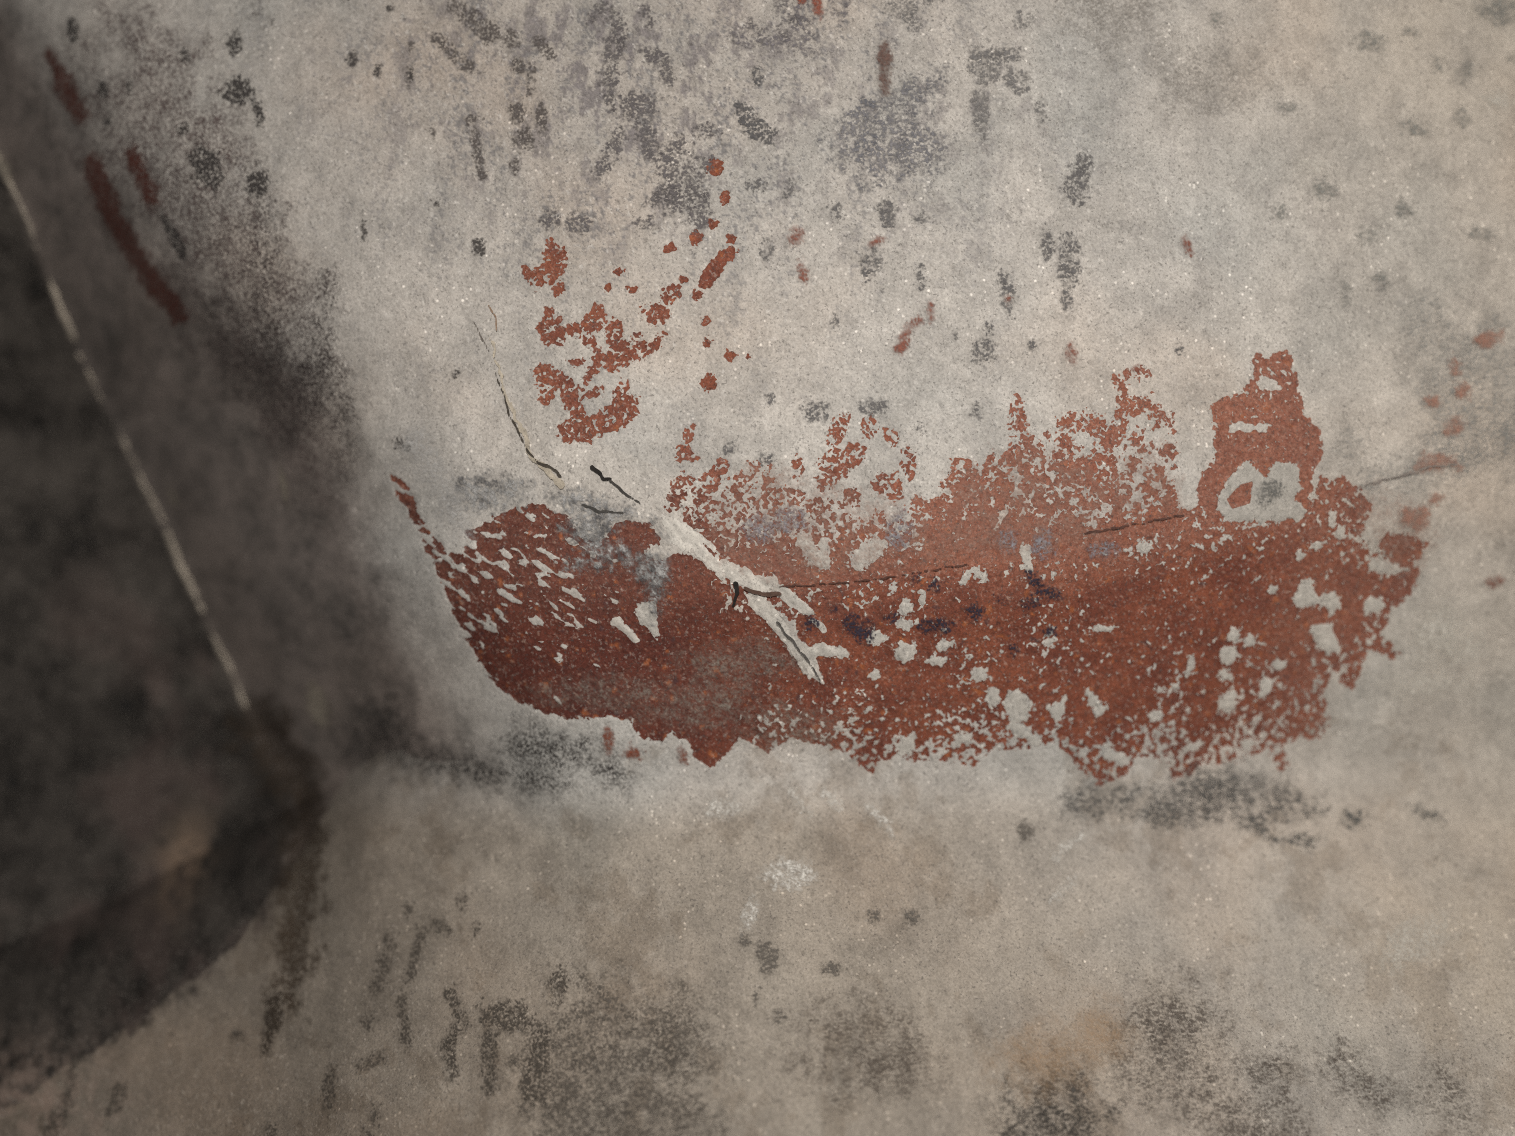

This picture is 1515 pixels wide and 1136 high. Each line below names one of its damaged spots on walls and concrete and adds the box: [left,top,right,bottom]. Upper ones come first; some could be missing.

damp [446,0,557,181]
damp [586,3,723,234]
damp [734,102,778,146]
damp [818,66,948,228]
damp [967,46,1048,139]
damp [65,3,355,478]
crack [474,305,640,514]
peeling [894,302,933,353]
damp [1042,223,1082,310]
peeling [390,349,1442,787]
damp [440,964,724,1136]
damp [1112,982,1310,1136]